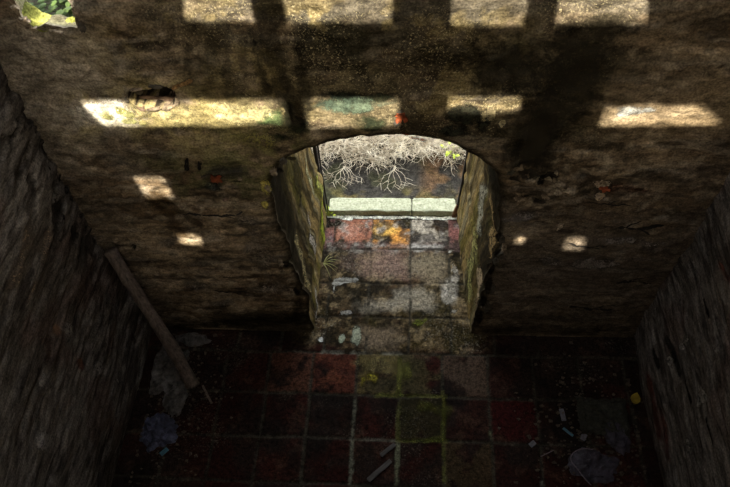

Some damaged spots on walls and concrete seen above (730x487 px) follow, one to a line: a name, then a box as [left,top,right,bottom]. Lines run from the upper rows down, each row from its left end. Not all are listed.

spalling [124,79,193,112]